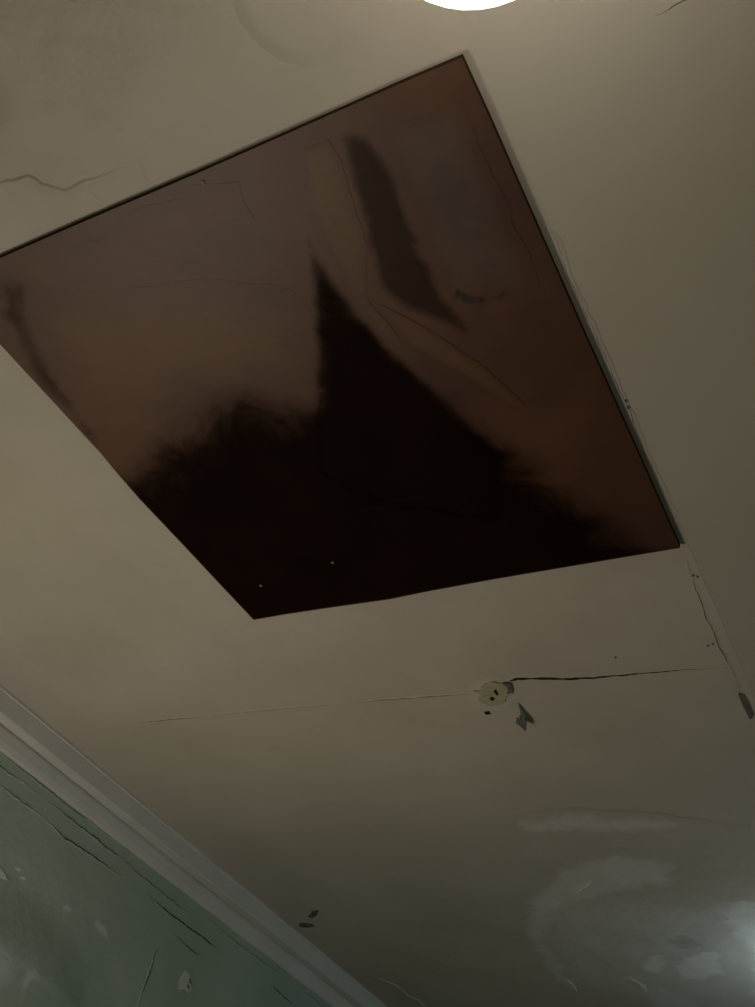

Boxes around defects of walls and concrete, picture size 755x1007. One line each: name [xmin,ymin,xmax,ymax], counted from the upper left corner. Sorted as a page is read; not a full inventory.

peeling [0,157,155,216]
crack [506,230,755,728]
crack [0,751,219,1007]